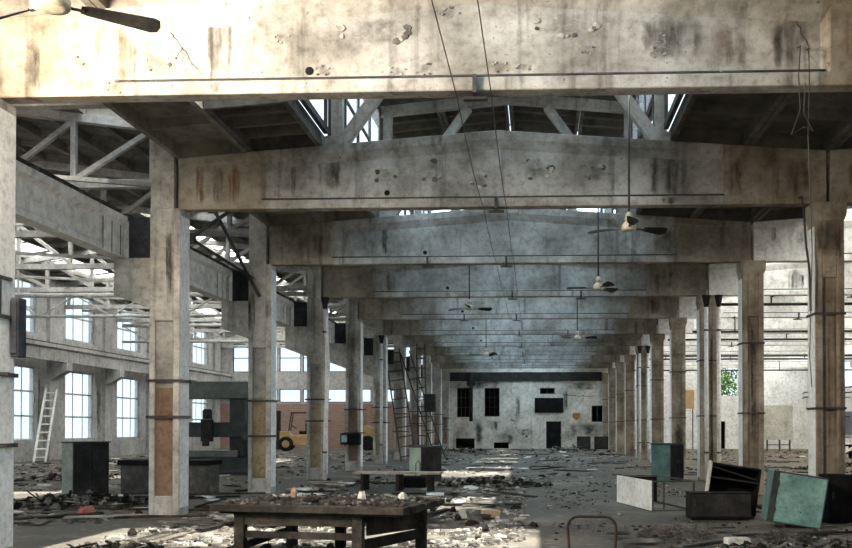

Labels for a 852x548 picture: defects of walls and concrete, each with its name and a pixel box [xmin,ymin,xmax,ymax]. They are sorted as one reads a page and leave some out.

peeling [392,24,412,45]